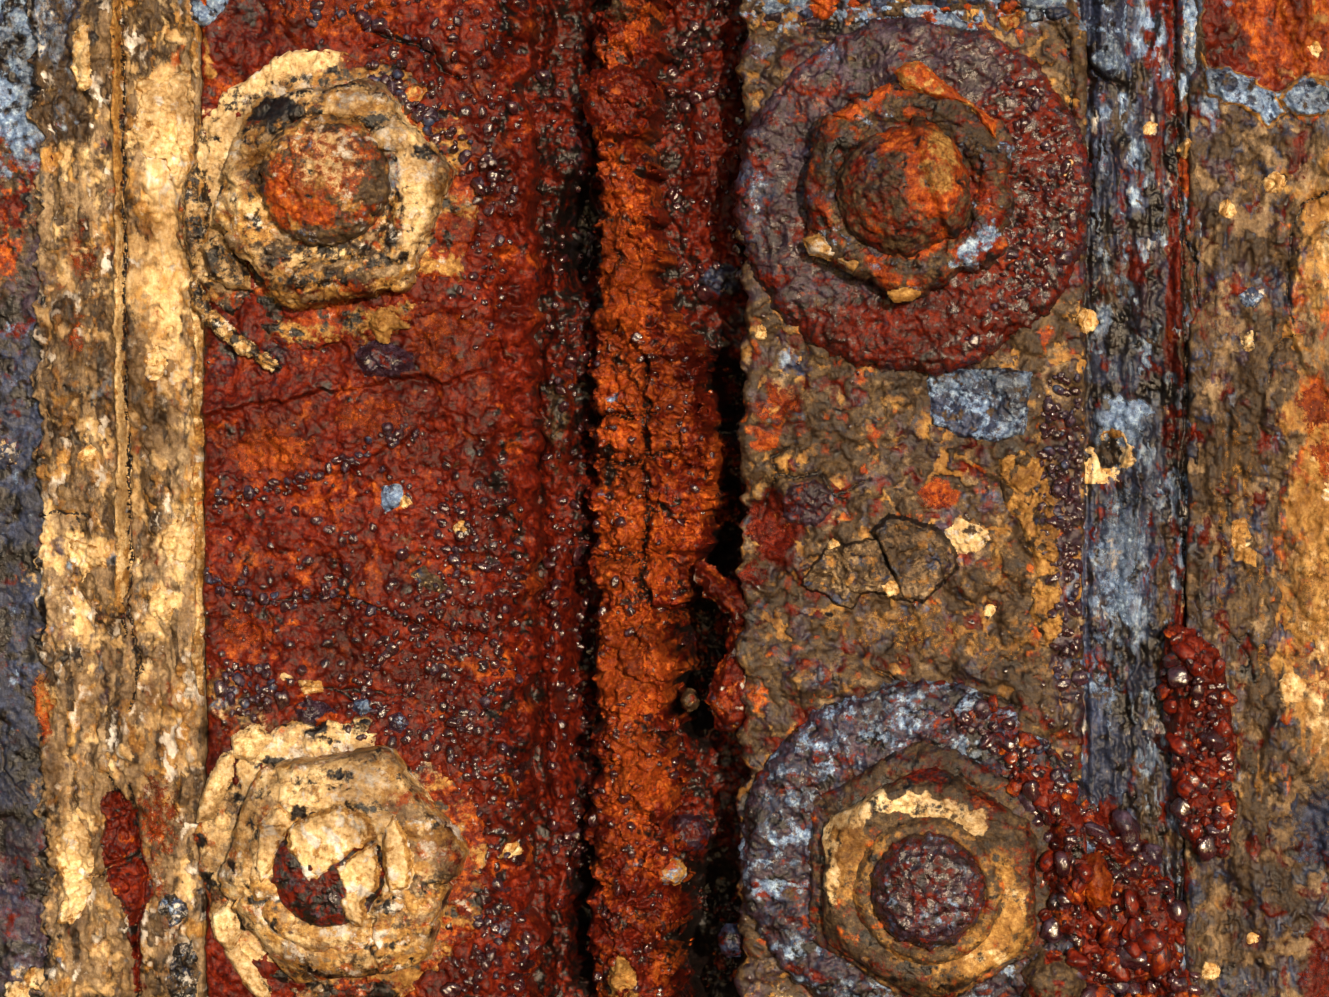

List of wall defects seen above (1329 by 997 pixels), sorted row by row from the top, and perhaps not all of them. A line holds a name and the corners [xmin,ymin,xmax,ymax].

rust [262,0,522,330]
rust [666,0,745,310]
rust [803,233,859,275]
rust [887,287,921,303]
rust [833,61,996,138]
rust [988,66,1080,321]
rust [203,399,524,827]
peeling [195,724,273,823]
rust [542,478,711,938]
peeling [210,900,272,997]
peeling [256,806,413,927]
rust [441,844,532,997]